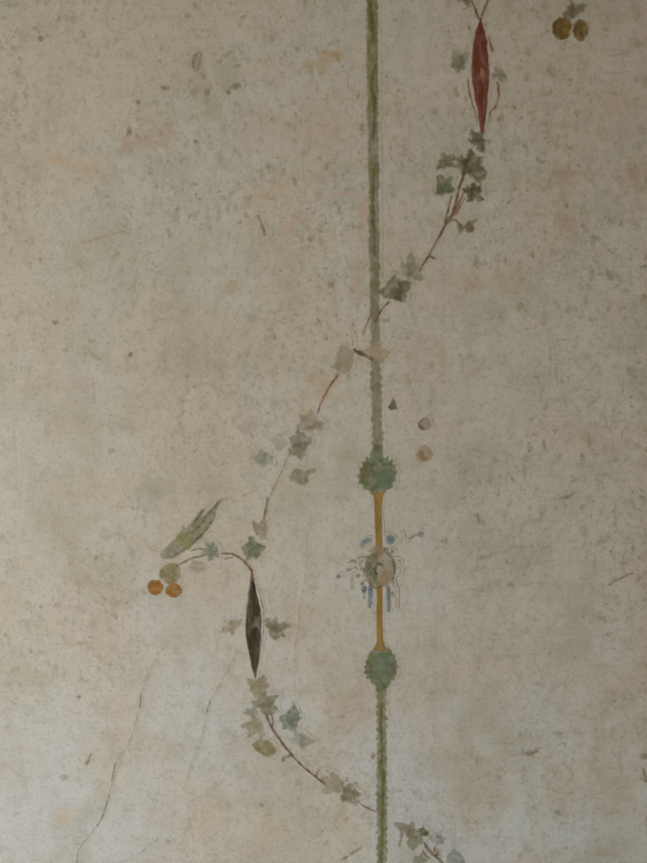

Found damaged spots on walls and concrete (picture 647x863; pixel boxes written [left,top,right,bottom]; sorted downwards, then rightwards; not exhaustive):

crack [72,644,167,863]